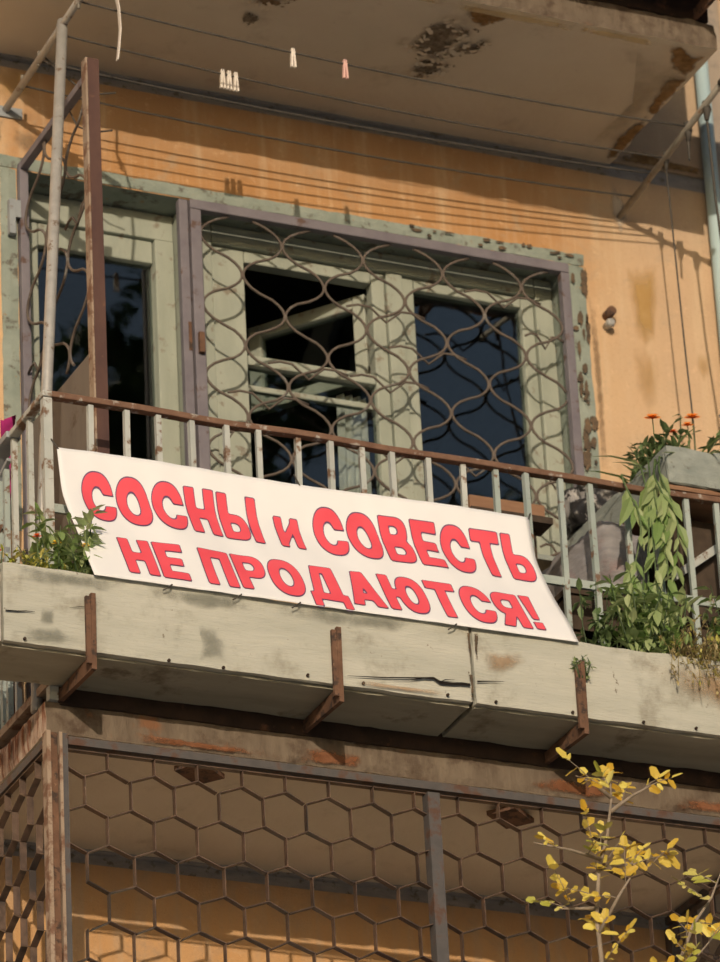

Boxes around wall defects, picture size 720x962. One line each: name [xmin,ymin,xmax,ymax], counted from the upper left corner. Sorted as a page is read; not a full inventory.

peeling [239,0,309,25]
peeling [399,11,505,78]
corrosion [649,47,703,114]
corrosion [608,123,644,158]
peeling [571,267,591,404]
peeling [583,416,599,471]
crack [357,676,504,686]